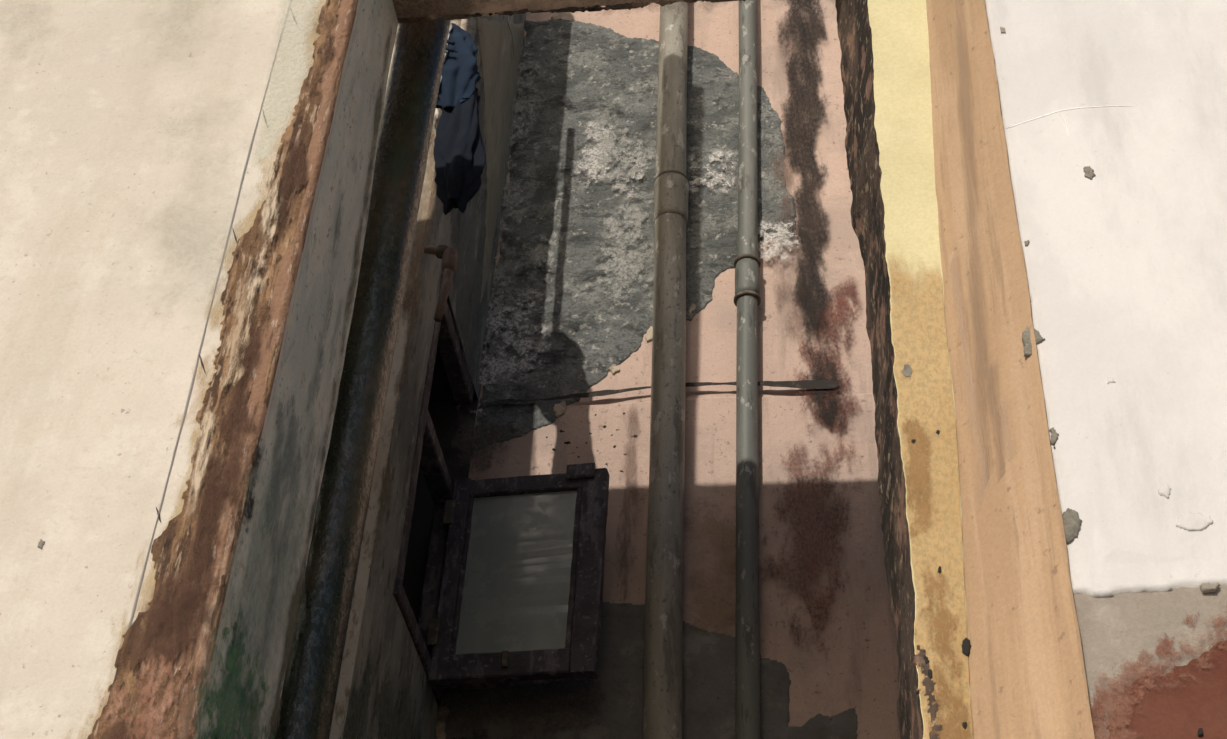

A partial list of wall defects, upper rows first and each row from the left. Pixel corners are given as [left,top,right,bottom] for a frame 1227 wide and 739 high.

rust [305,0,326,64]
rust [225,197,266,274]
spalling [401,0,745,458]
spalling [757,86,796,242]
water stain [758,0,845,427]
rust [141,561,157,612]
spalling [1200,583,1220,593]
spalling [435,602,645,739]
spalling [760,655,858,739]
peeling [1090,615,1227,739]